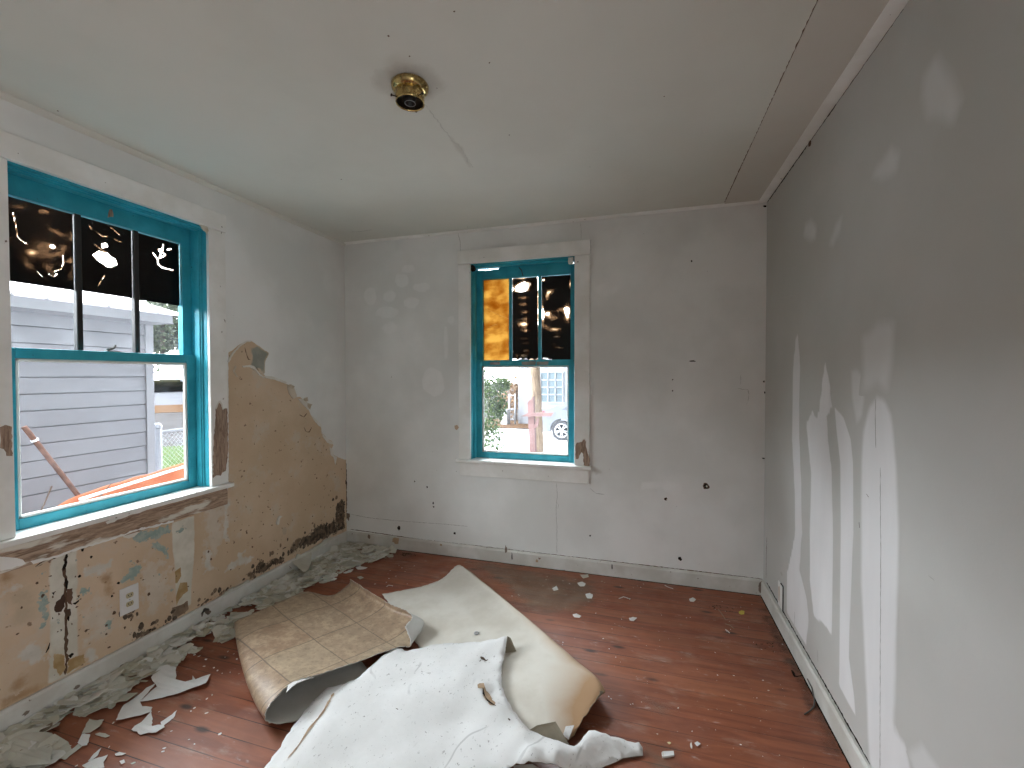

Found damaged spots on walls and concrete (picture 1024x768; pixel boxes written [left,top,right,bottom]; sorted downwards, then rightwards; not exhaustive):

peeling [575,438,590,466]
peeling [0,341,350,699]
leakage [197,495,346,607]
crack [35,554,70,674]